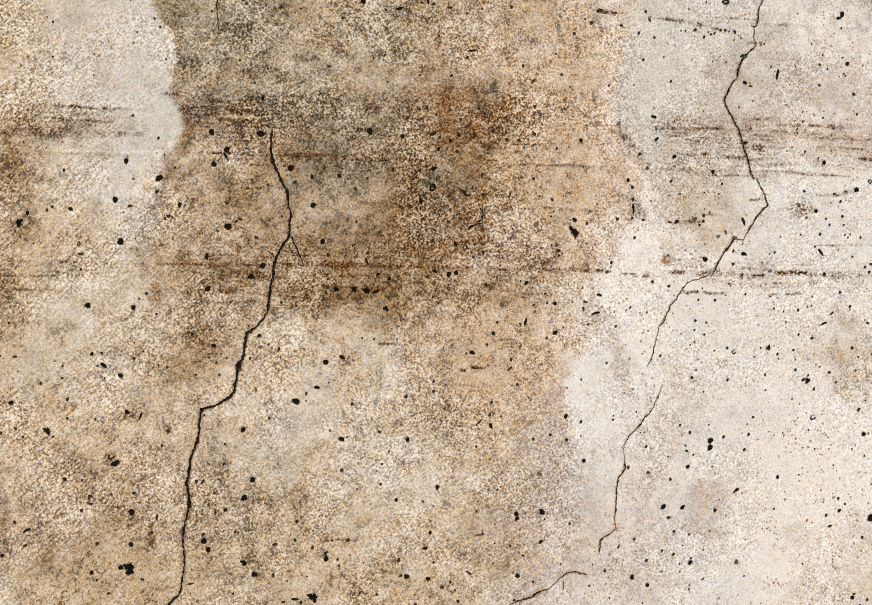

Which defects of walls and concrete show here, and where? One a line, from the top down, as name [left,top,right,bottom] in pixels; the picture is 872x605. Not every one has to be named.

crack [647,0,769,366]
leakage [0,0,599,515]
crack [167,126,303,605]
leakage [0,547,167,605]
leakage [93,491,134,520]
leakage [232,527,301,588]
leakage [290,486,330,557]
leakage [321,508,546,605]
crack [508,570,587,605]
crack [598,385,663,554]